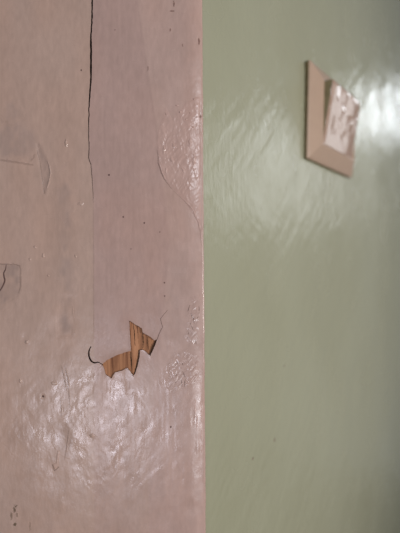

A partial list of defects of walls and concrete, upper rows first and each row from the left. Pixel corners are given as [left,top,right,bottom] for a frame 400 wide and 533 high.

crack [86,0,94,186]
peeling [88,321,157,378]